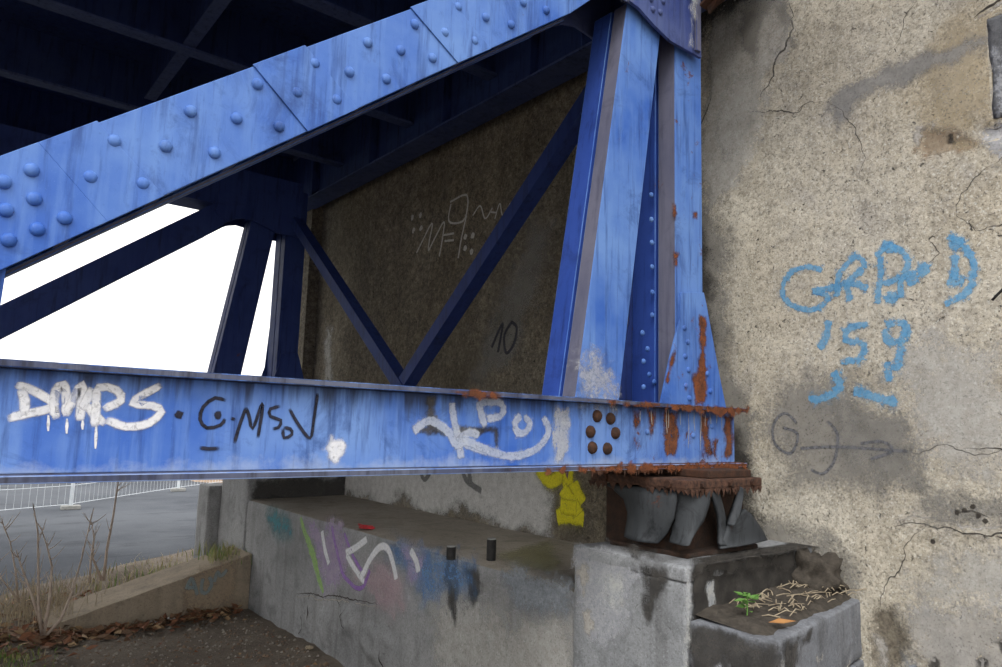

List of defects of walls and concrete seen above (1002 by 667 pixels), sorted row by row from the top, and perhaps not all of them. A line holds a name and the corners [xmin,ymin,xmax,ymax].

crack [751,101,866,173]
rust [462,389,500,401]
rust [545,316,762,499]
crack [892,444,1002,456]
crack [877,510,1002,613]
crack [298,593,378,634]